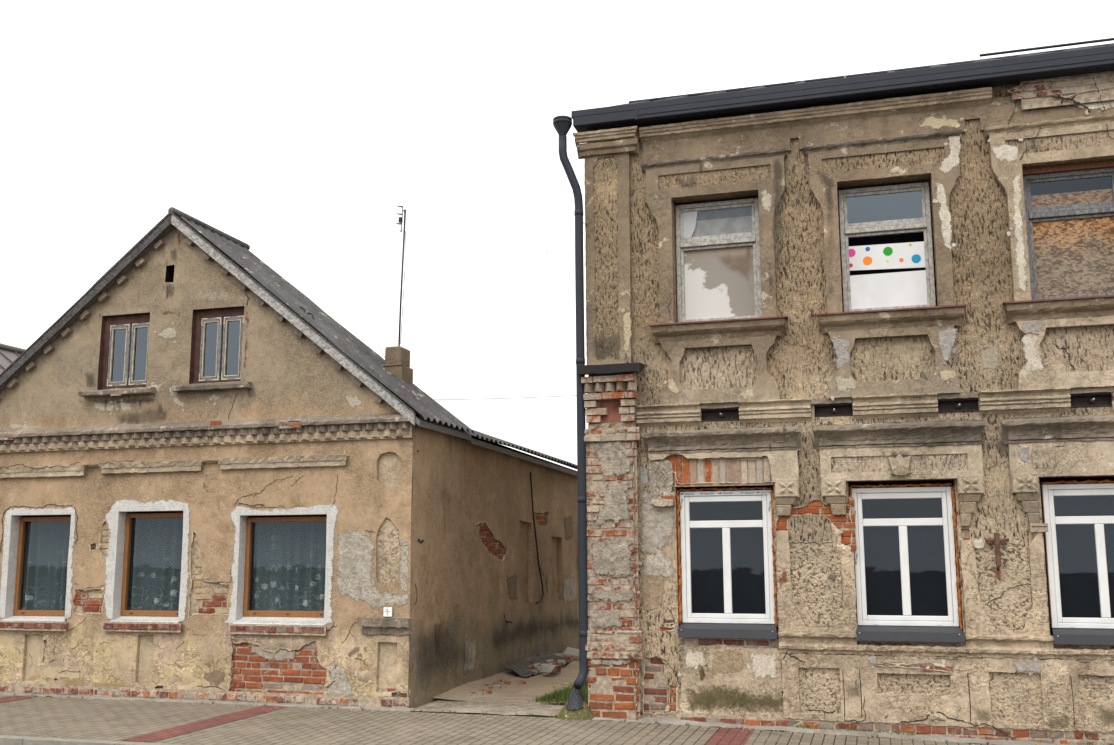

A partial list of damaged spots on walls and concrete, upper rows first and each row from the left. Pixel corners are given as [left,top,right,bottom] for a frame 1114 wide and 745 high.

spalling [991,71,1114,115]
crack [235,476,301,508]
spalling [72,587,105,616]
spalling [188,530,230,618]
peeling [334,525,411,609]
spalling [475,521,519,599]
spalling [563,441,857,632]
spalling [204,640,362,696]
spalling [590,644,780,715]